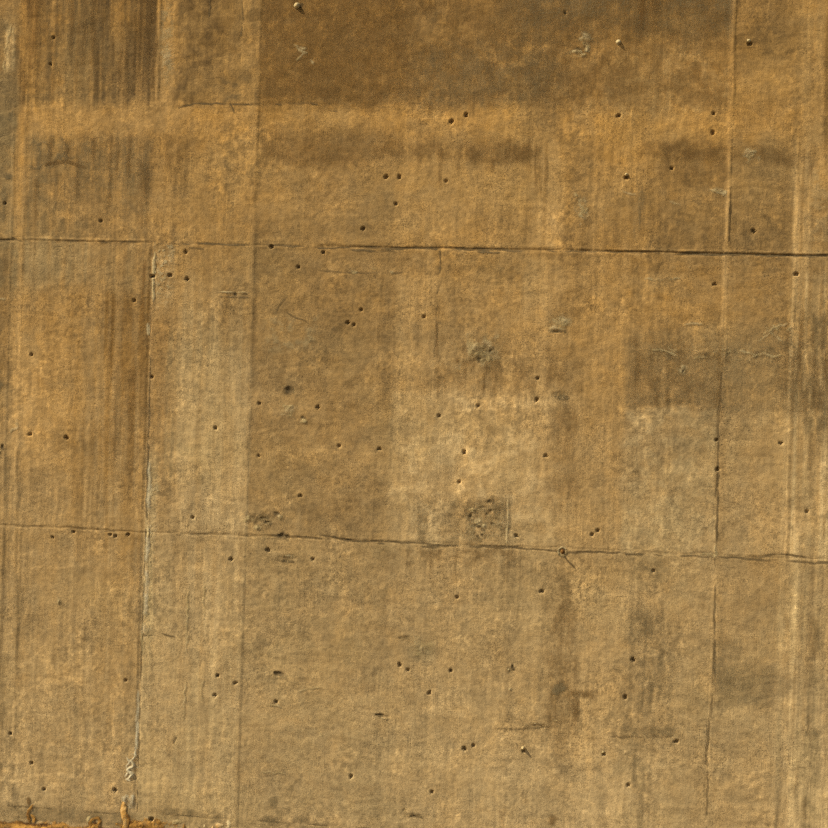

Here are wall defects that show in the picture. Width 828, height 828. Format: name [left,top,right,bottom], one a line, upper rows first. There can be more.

crack [710,589,718,673]
crack [704,705,712,814]
rust [0,798,103,828]
rust [115,818,185,828]